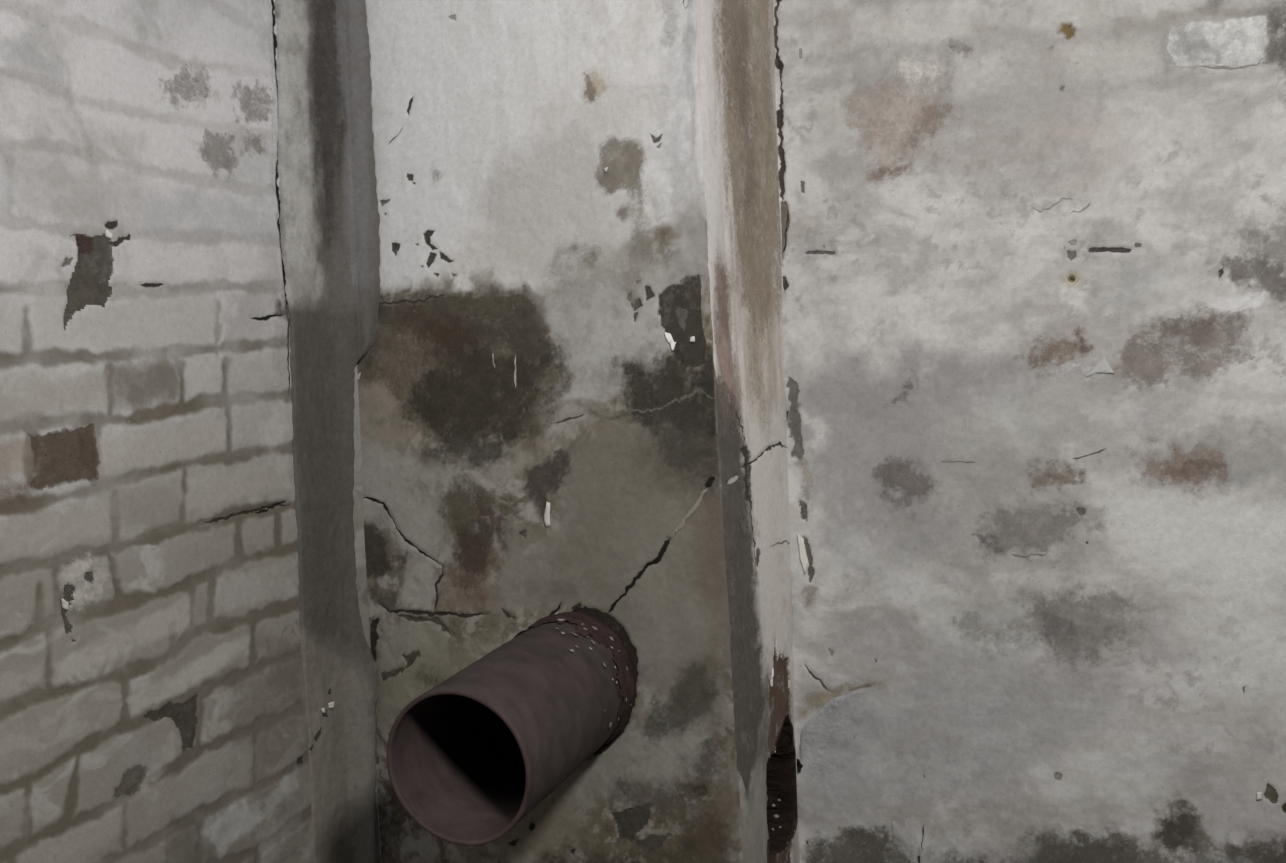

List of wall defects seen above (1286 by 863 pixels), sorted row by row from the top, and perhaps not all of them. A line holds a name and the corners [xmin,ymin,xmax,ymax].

spalling [62,220,131,330]
crack [251,0,291,394]
damp [597,139,644,304]
damp [717,0,782,364]
crack [774,0,786,201]
peeling [1167,16,1269,69]
spalling [19,424,99,489]
crack [363,497,488,636]
damp [359,292,571,466]
spalling [627,275,765,795]
crack [608,442,788,613]
damp [1016,801,1286,863]